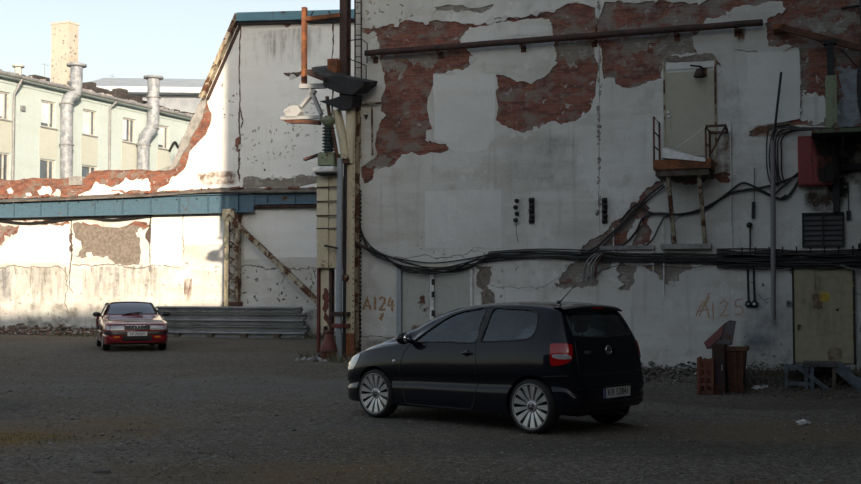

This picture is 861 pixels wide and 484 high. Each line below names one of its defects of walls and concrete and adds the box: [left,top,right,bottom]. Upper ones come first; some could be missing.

flaking render [0,103,212,198]
crack [236,28,244,181]
flaking render [357,0,861,183]
flaking render [0,219,166,306]
crack [0,214,185,314]
flaking render [475,252,503,304]
flaking render [551,172,735,290]